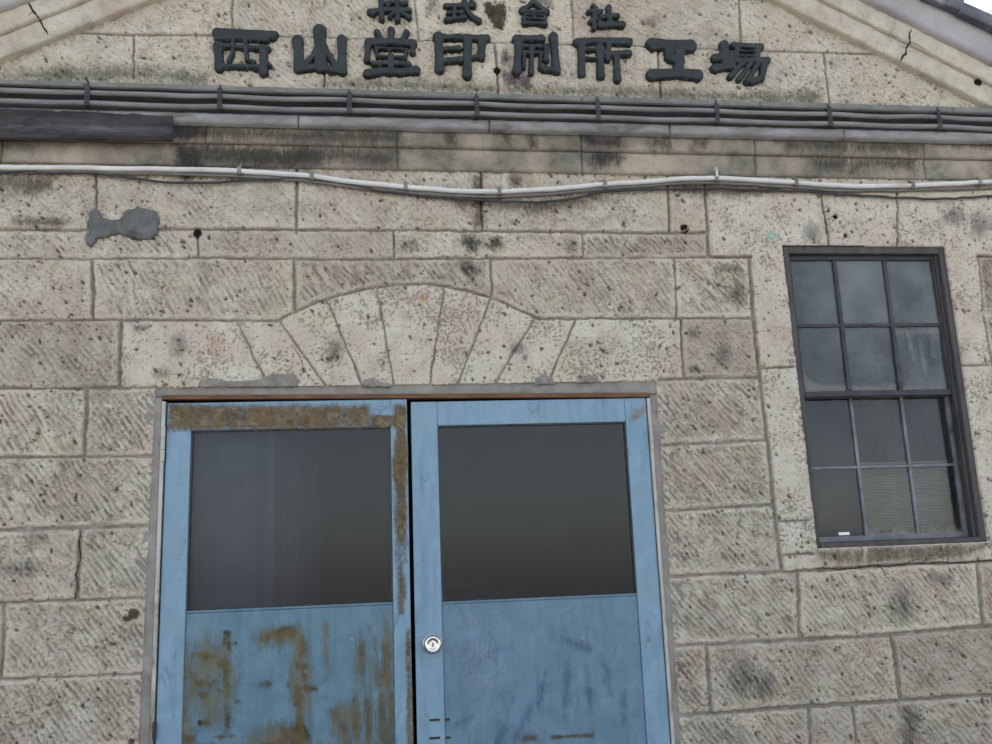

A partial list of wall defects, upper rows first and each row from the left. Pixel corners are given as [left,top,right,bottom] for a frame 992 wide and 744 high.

crack [28,2,49,35]
crack [900,29,926,61]
corrosion [167,404,408,614]
corrosion [182,631,239,743]
corrosion [261,626,318,744]
corrosion [332,630,395,744]
corrosion [406,630,414,744]